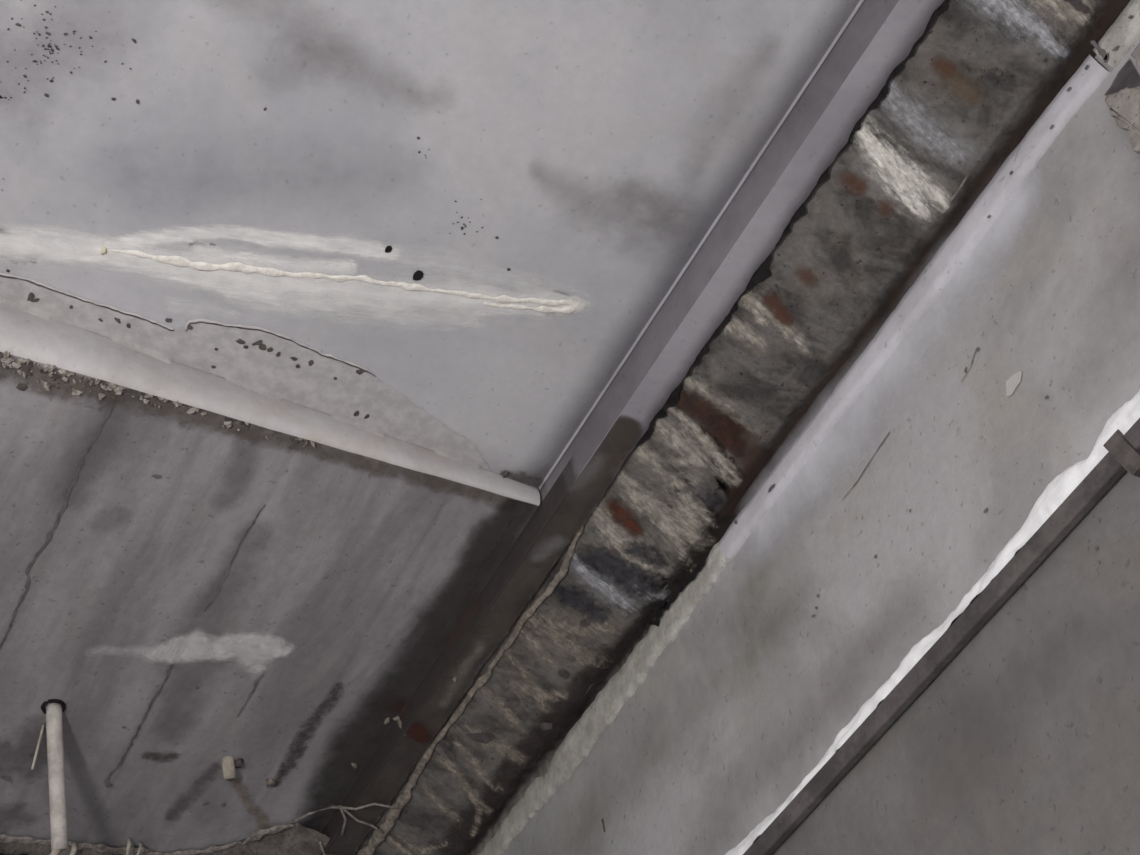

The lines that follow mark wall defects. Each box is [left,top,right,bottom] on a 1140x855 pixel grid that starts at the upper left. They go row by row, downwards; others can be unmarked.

flaking render [1105,43,1140,155]
efflorescence [0,225,585,323]
water stain [303,0,1130,855]
peeling [1006,371,1022,396]
crack [0,397,117,648]
rust [609,500,641,535]
crack [104,662,175,786]
water stain [143,753,178,761]
water stain [141,630,293,673]
water stain [277,683,343,785]
peeling [521,558,707,803]
water stain [68,824,294,855]